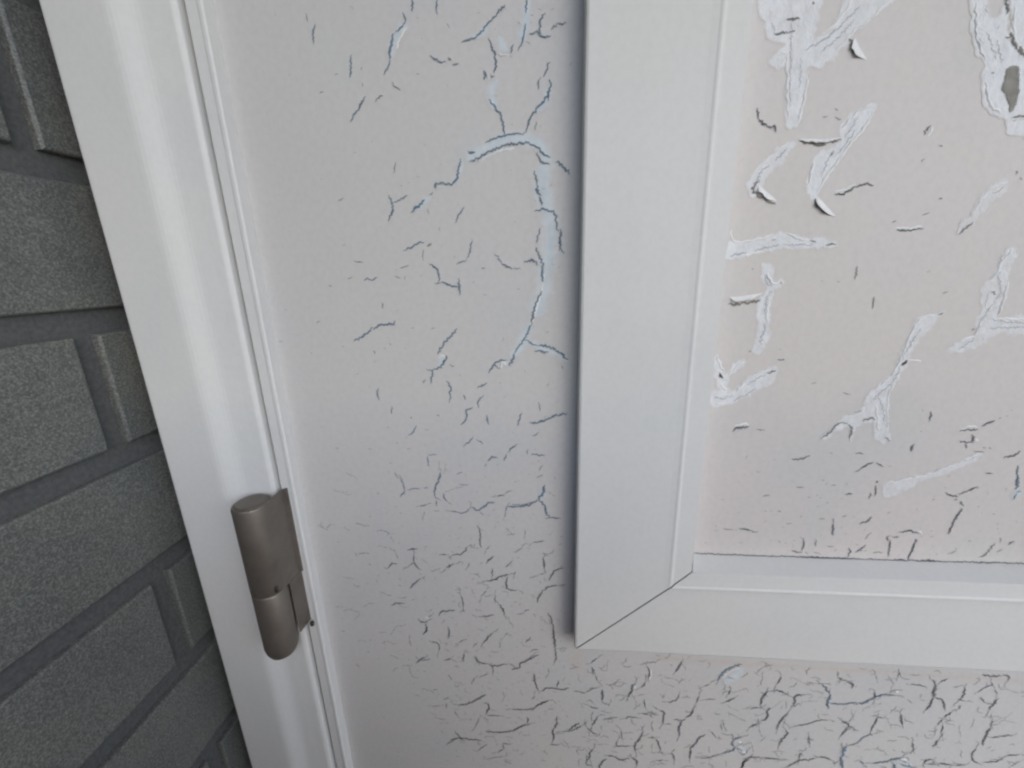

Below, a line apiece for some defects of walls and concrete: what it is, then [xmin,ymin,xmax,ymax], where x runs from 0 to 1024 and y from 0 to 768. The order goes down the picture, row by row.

peeling [743,0,897,217]
peeling [968,0,1024,138]
crack [320,0,1024,768]
peeling [710,230,839,409]
peeling [820,309,946,445]
peeling [945,245,1024,355]
peeling [881,450,985,499]